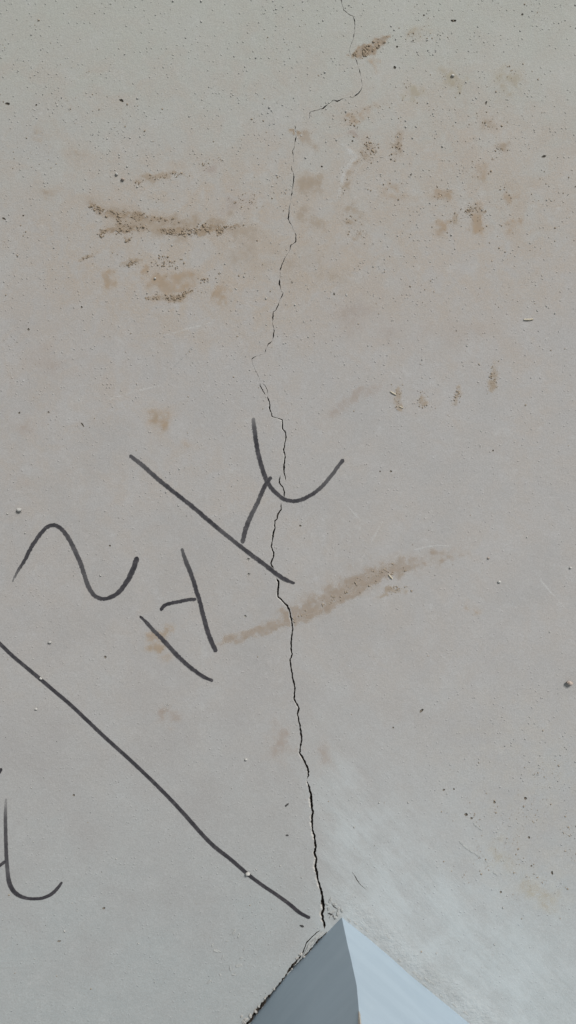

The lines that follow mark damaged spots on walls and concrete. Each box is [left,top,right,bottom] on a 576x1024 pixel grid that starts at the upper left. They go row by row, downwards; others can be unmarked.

leakage [89,201,256,263]
crack [241,0,362,1024]